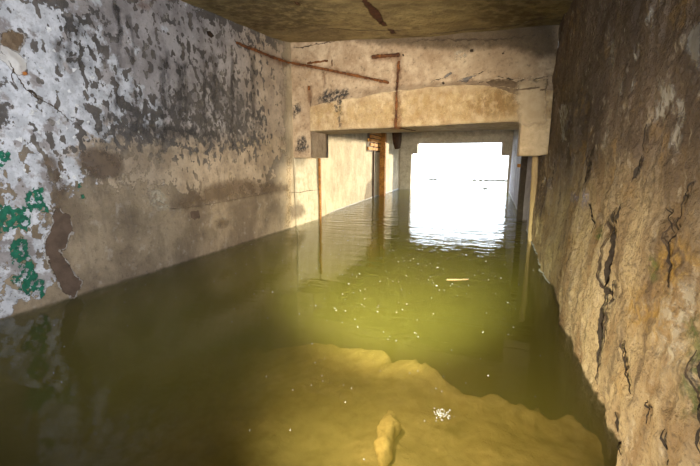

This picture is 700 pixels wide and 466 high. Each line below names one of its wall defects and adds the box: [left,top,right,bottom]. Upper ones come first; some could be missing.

corrosion [362,0,396,34]
leakage [79,149,121,178]
peeling [0,0,287,318]
crack [631,124,647,182]
crack [582,148,650,424]
crack [661,182,693,288]